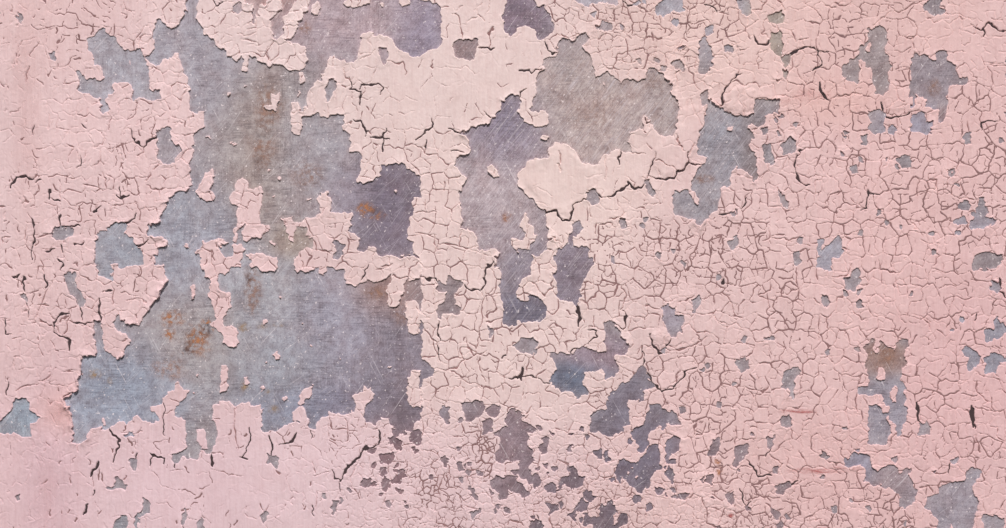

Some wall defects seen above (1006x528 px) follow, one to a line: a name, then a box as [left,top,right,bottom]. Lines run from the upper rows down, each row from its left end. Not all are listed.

crack [0,0,199,421]
crack [204,230,249,270]
crack [202,0,308,78]
peeling [64,0,478,515]
peeling [455,0,685,338]
crack [225,0,1006,528]
peeling [672,90,798,226]
peeling [909,50,968,135]
crack [20,399,258,528]
peeling [439,400,628,528]
peeling [549,321,690,512]
peeling [844,338,1005,528]